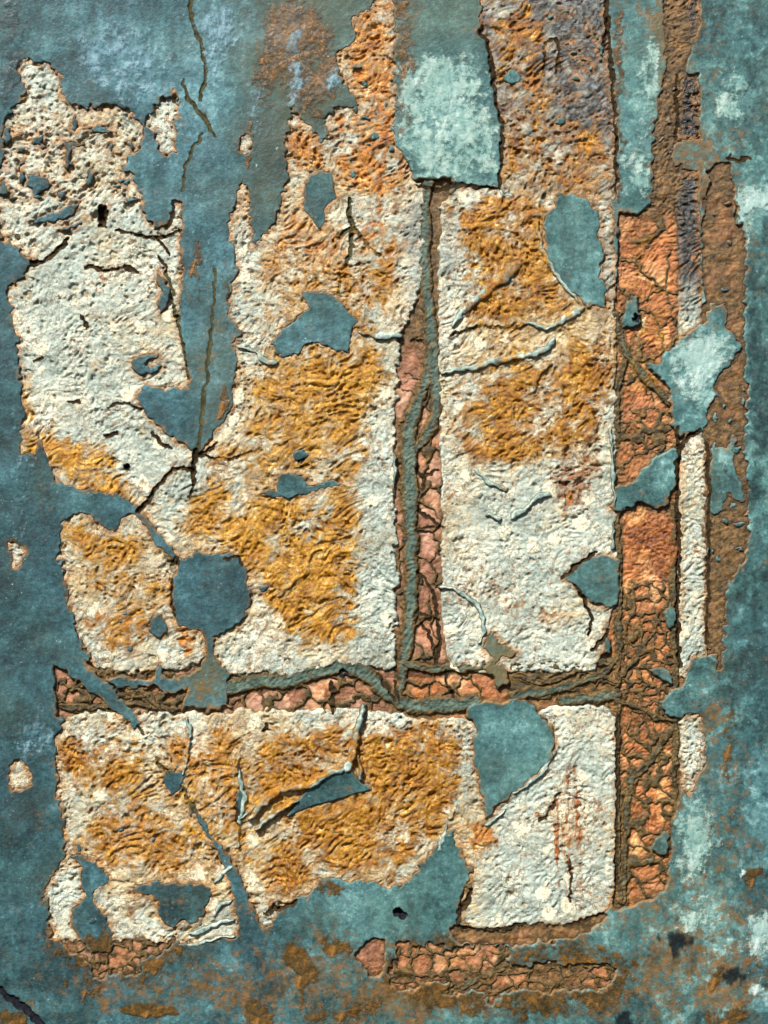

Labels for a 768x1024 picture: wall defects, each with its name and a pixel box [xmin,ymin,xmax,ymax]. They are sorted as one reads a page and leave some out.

crack [180,0,216,192]
crack [84,228,261,513]
peeling [0,0,427,691]
corrosion [175,0,420,648]
peeling [406,0,750,797]
crack [414,569,455,698]
corrosion [624,516,679,574]
peeling [42,666,674,1005]
corrosion [282,941,638,1024]
crack [456,888,527,932]
crack [563,855,604,927]
crack [612,715,620,885]